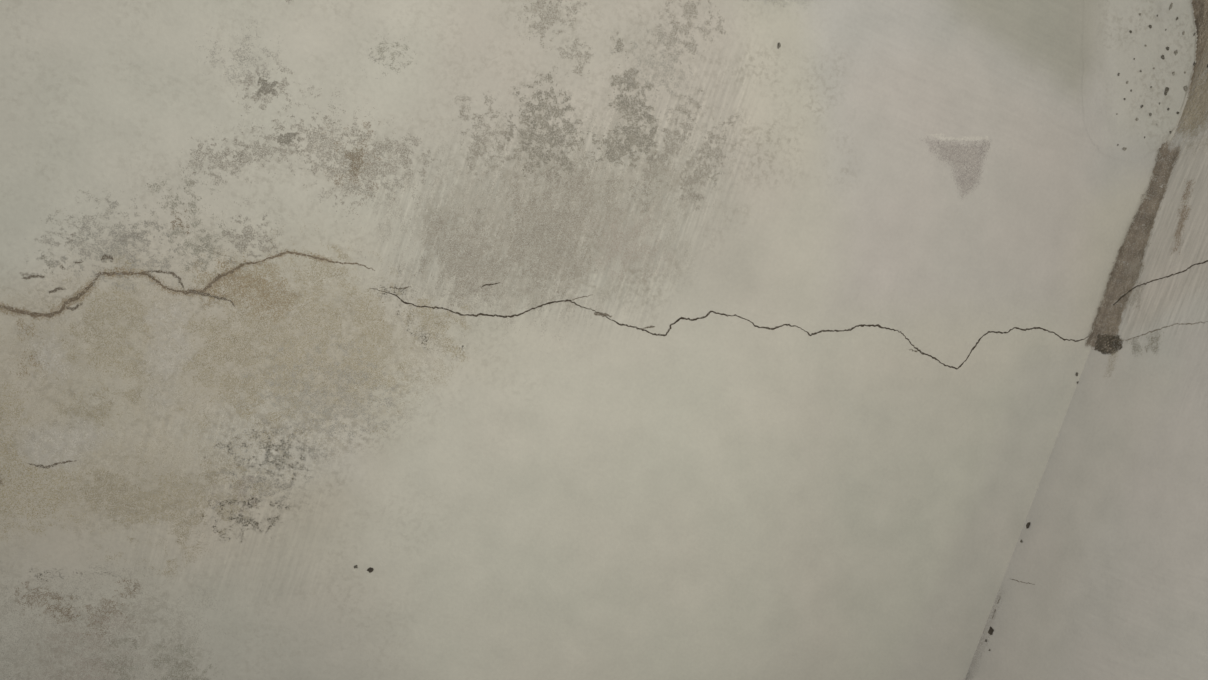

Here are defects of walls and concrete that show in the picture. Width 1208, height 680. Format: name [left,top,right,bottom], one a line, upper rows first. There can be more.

damp [0,0,743,680]
crack [0,249,1208,369]